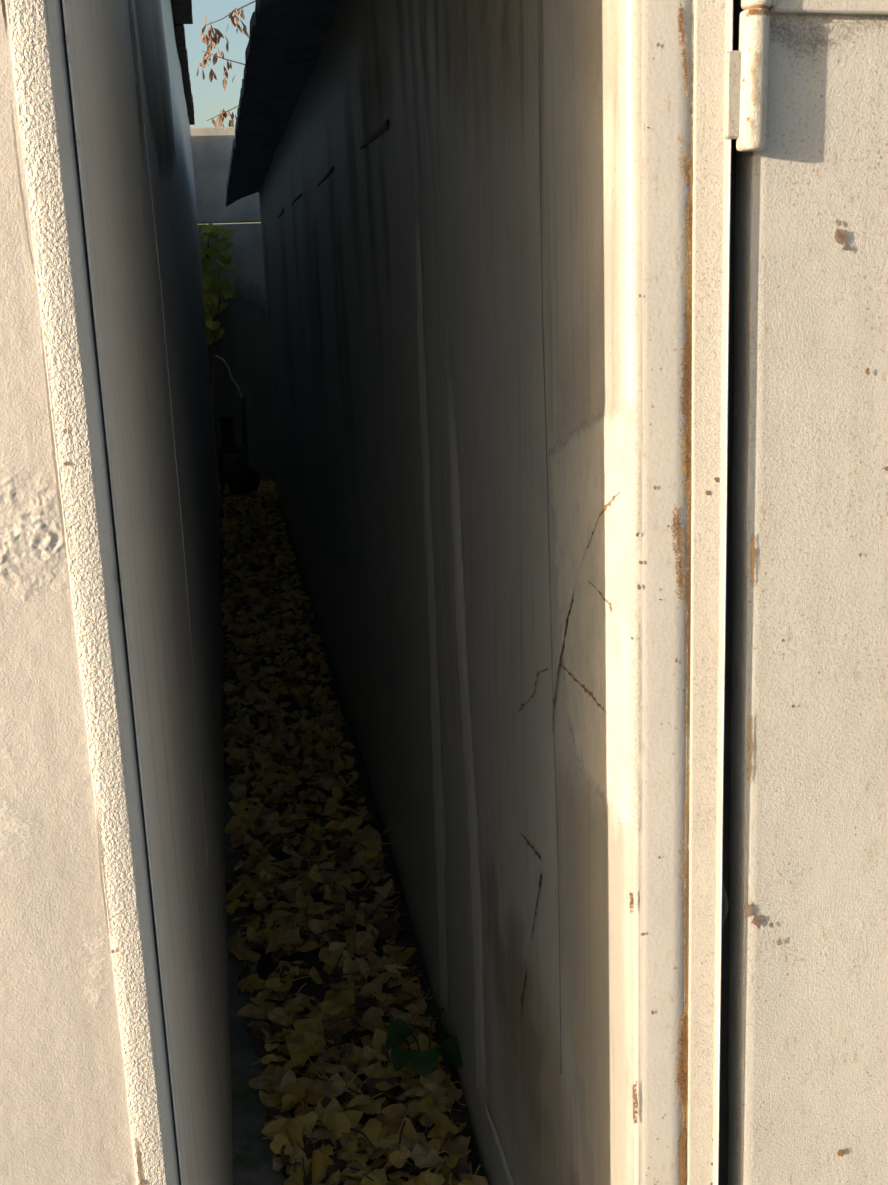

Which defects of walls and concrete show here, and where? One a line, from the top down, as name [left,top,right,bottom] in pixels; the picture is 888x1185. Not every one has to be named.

corrosion [745,8,770,17]
crack [519,492,620,721]
corrosion [667,3,694,1185]
crack [523,836,542,937]
corrosion [744,903,783,945]